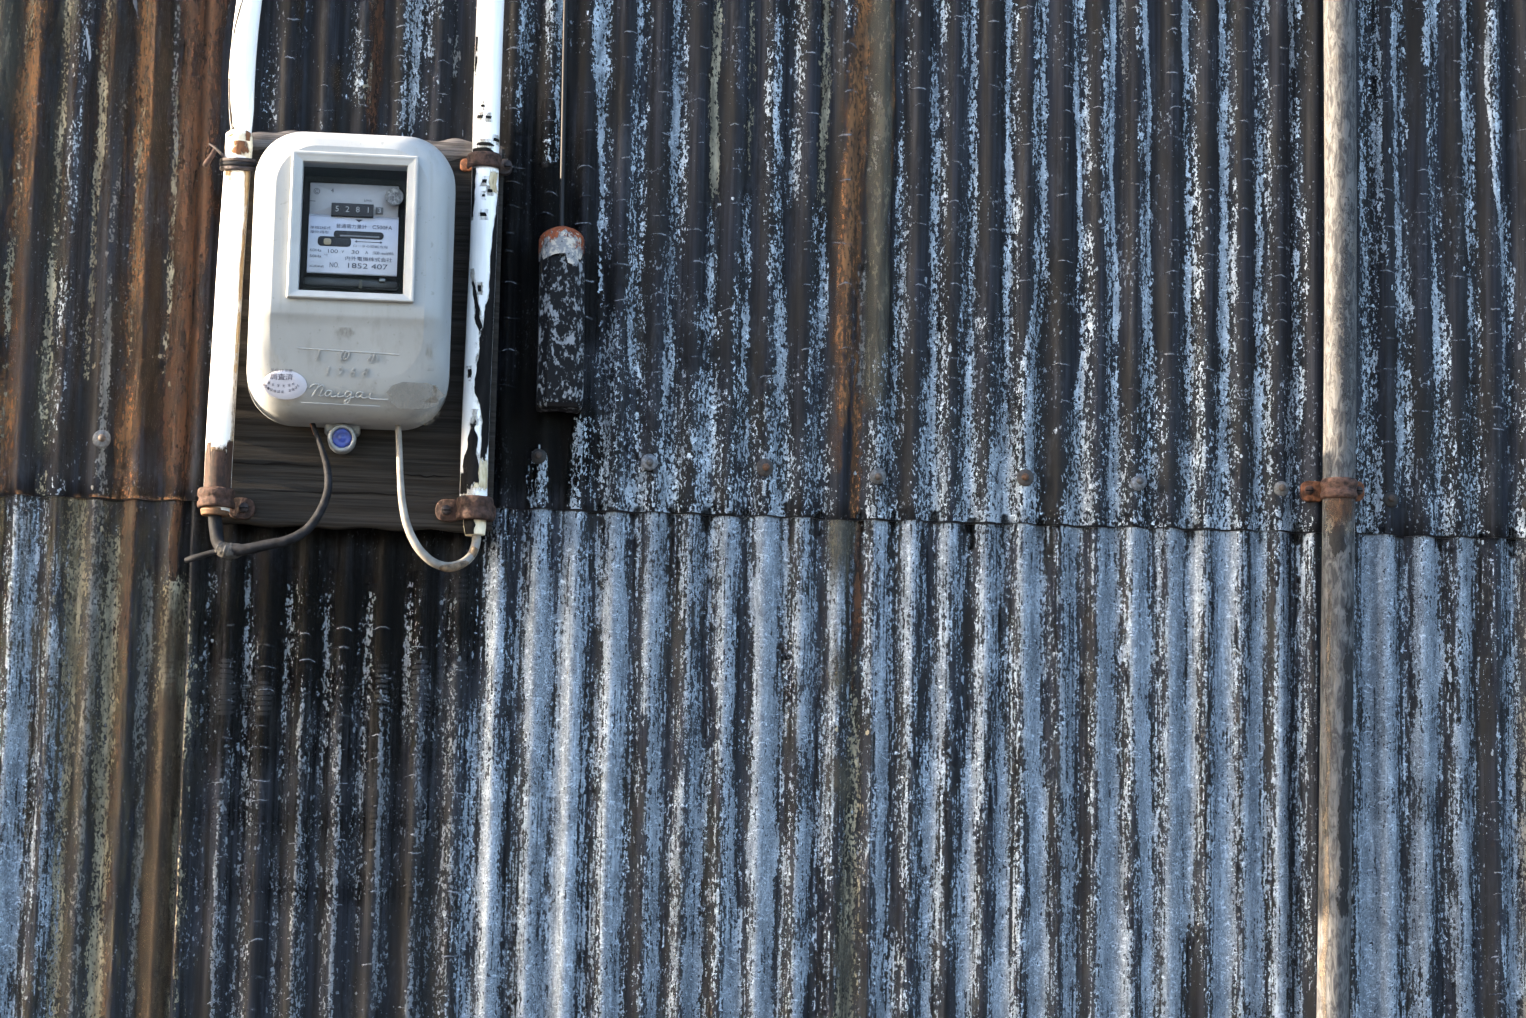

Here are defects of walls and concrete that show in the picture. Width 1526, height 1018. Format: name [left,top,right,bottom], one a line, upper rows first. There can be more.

corrosion [0,0,53,573]
corrosion [72,0,251,1018]
corrosion [538,226,584,254]
peeling [266,0,1320,1018]
corrosion [832,0,873,690]
peeling [1328,0,1526,1018]